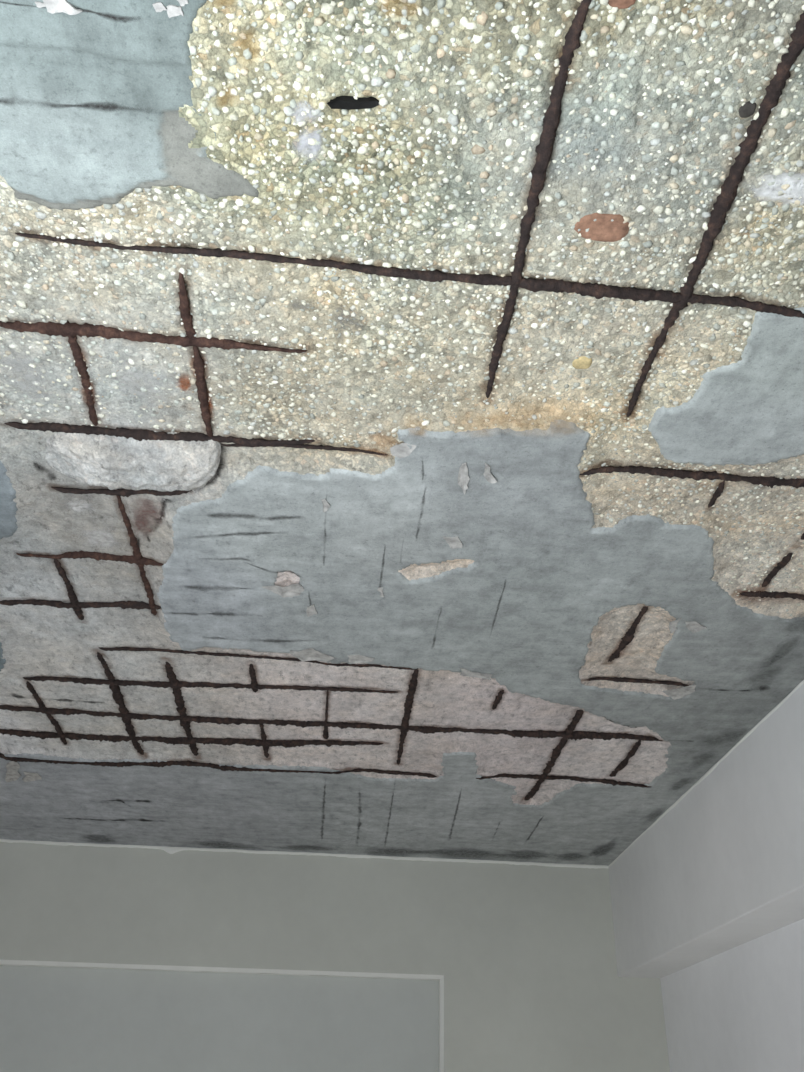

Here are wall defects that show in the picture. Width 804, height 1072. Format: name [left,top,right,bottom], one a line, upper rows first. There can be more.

corrosion [15,0,804,417]
corrosion [0,272,388,456]
spalling [0,0,804,807]
corrosion [0,487,192,620]
corrosion [579,465,804,508]
corrosion [739,553,804,601]
corrosion [0,647,663,801]
corrosion [586,677,689,687]